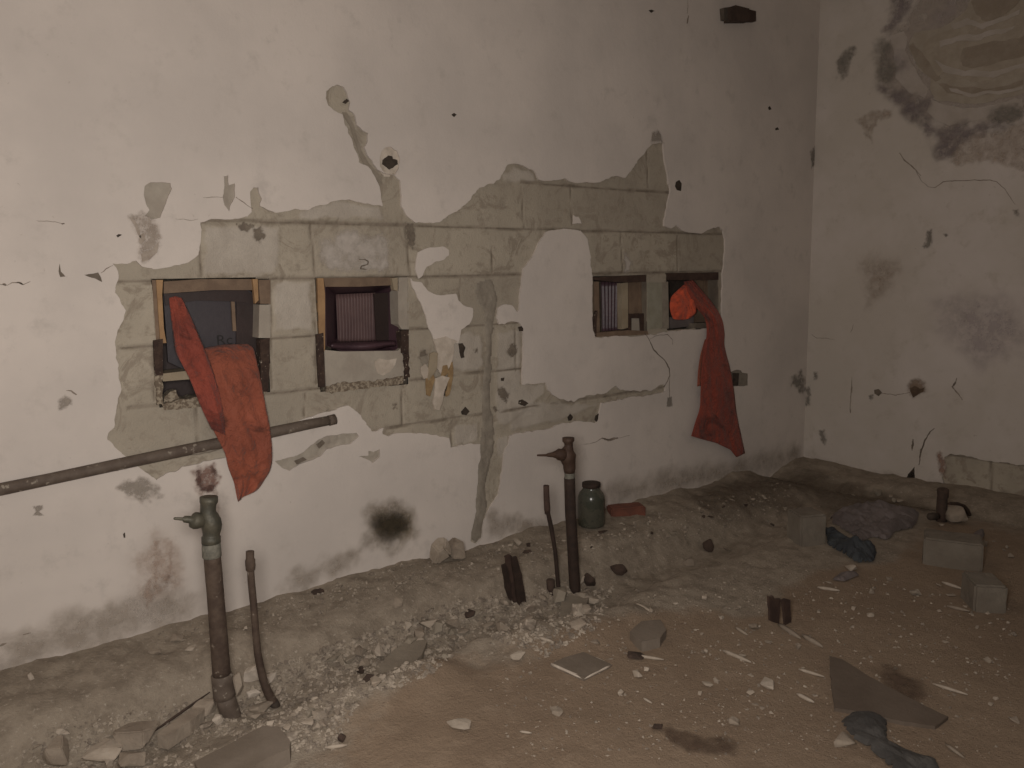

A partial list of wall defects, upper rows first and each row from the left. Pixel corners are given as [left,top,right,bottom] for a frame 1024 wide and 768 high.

water stain [878,0,1024,157]
crack [899,153,1016,205]
flaking render [107,85,724,543]
crack [911,428,935,464]
corrosion [196,465,218,492]
flaking render [942,454,1024,496]